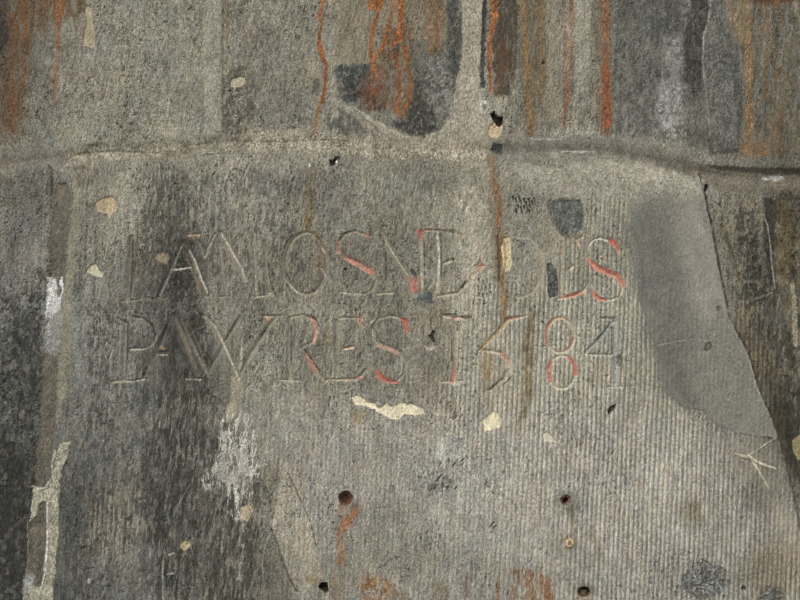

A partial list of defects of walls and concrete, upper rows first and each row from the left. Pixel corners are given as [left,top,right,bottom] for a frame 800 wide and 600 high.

rust [3,0,84,132]
rust [314,0,328,130]
rust [361,0,412,116]
rust [601,0,612,134]
spalling [94,196,117,218]
spalling [352,395,425,419]
spalling [481,412,502,430]